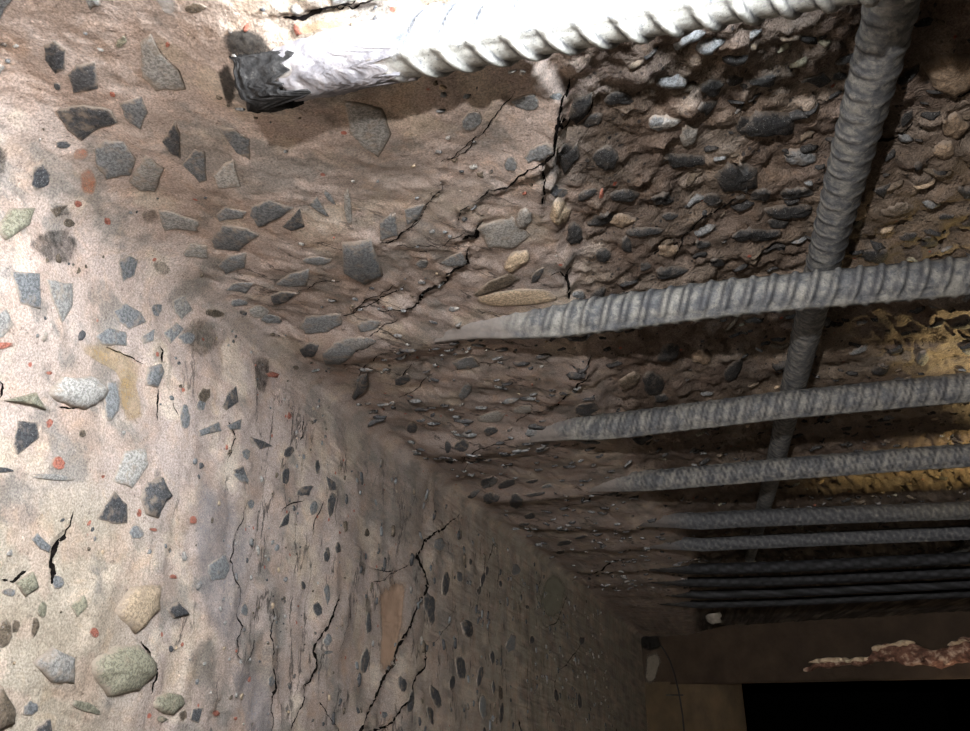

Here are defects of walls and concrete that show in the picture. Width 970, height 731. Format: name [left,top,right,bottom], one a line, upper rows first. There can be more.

crack [283,0,374,21]
crack [343,79,594,385]
crack [393,357,511,398]
crack [2,571,26,583]
crack [49,511,74,584]
crack [230,500,460,731]